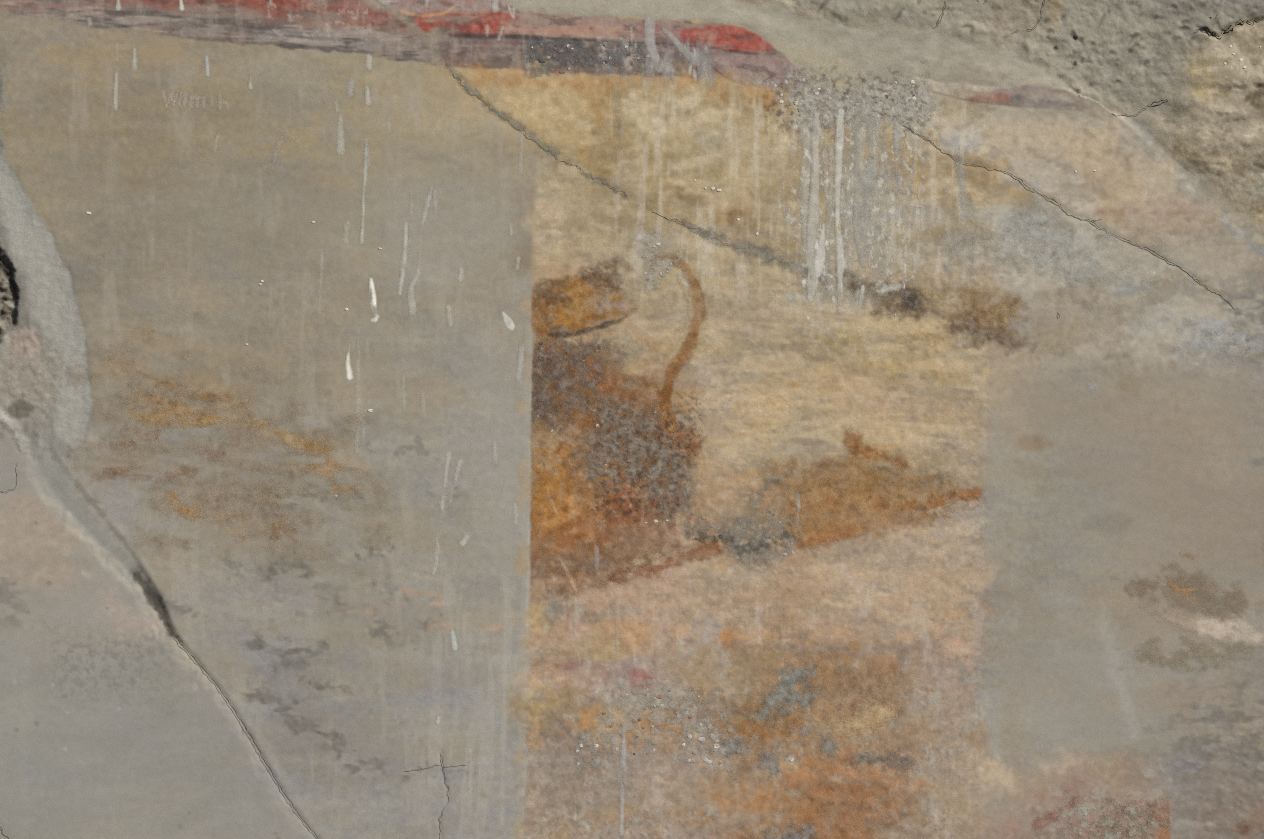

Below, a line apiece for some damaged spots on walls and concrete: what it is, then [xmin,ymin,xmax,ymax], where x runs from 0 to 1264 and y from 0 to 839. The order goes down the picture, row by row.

crack [1197,14,1261,39]
spalling [0,251,18,334]
crack [447,65,627,196]
crack [658,214,774,260]
water stain [777,67,935,317]
water stain [950,288,1020,347]
crack [905,123,1232,306]
rust [531,254,729,593]
rust [763,432,981,546]
crack [134,573,319,839]